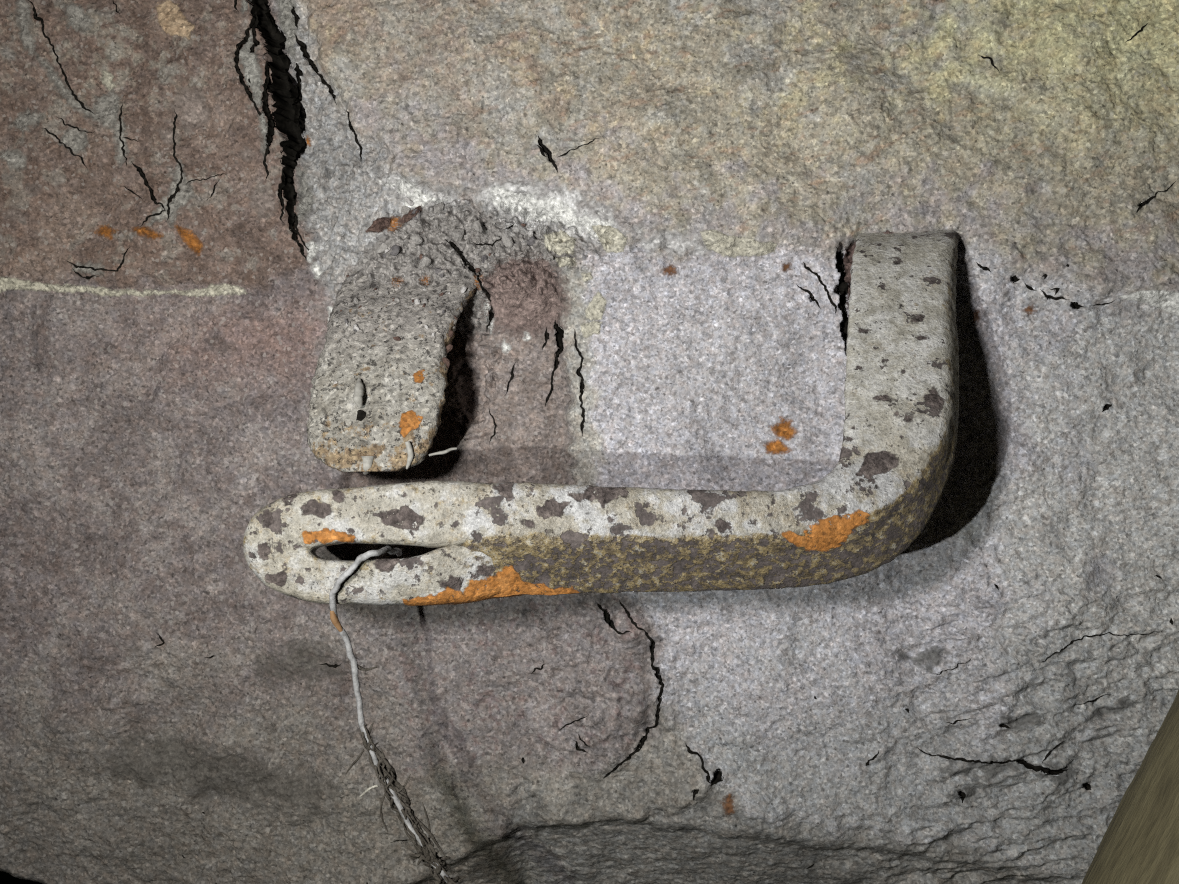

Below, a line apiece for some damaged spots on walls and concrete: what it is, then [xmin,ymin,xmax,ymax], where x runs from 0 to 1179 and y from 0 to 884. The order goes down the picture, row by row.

crack [28,0,224,279]
crack [234,0,362,261]
crack [796,247,848,355]
crack [542,320,585,432]
corrosion [399,410,423,437]
corrosion [766,419,796,454]
corrosion [281,490,345,518]
corrosion [257,542,271,560]
corrosion [265,571,287,587]
corrosion [436,575,463,591]
crack [597,601,664,778]
crack [685,743,723,801]